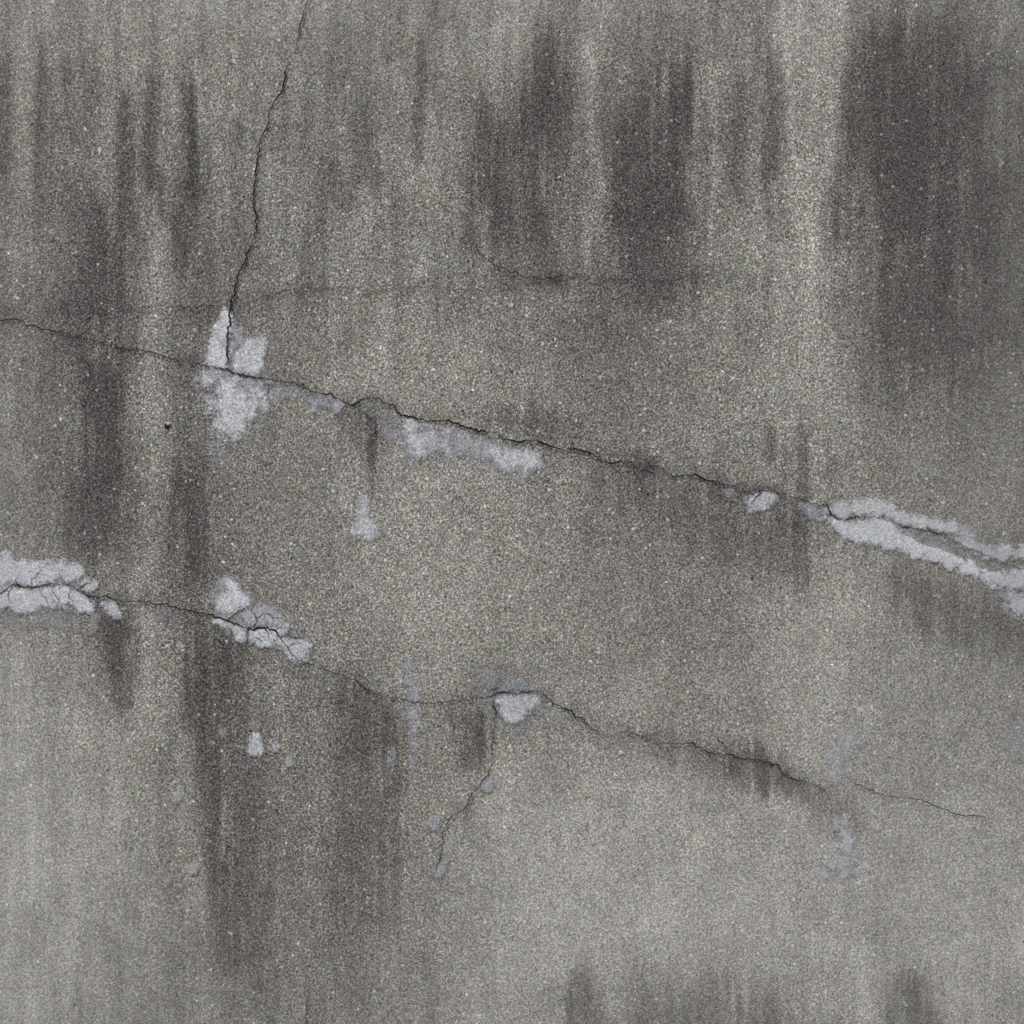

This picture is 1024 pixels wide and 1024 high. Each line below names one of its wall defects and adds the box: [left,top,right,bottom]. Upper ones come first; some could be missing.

damp [619,62,689,307]
damp [879,34,954,377]
crack [114,8,779,502]
crack [0,318,85,339]
damp [398,418,543,479]
crack [820,504,858,521]
crack [0,581,302,656]
damp [494,693,540,724]
crack [329,671,640,866]
crack [676,737,824,790]
crack [918,799,980,817]